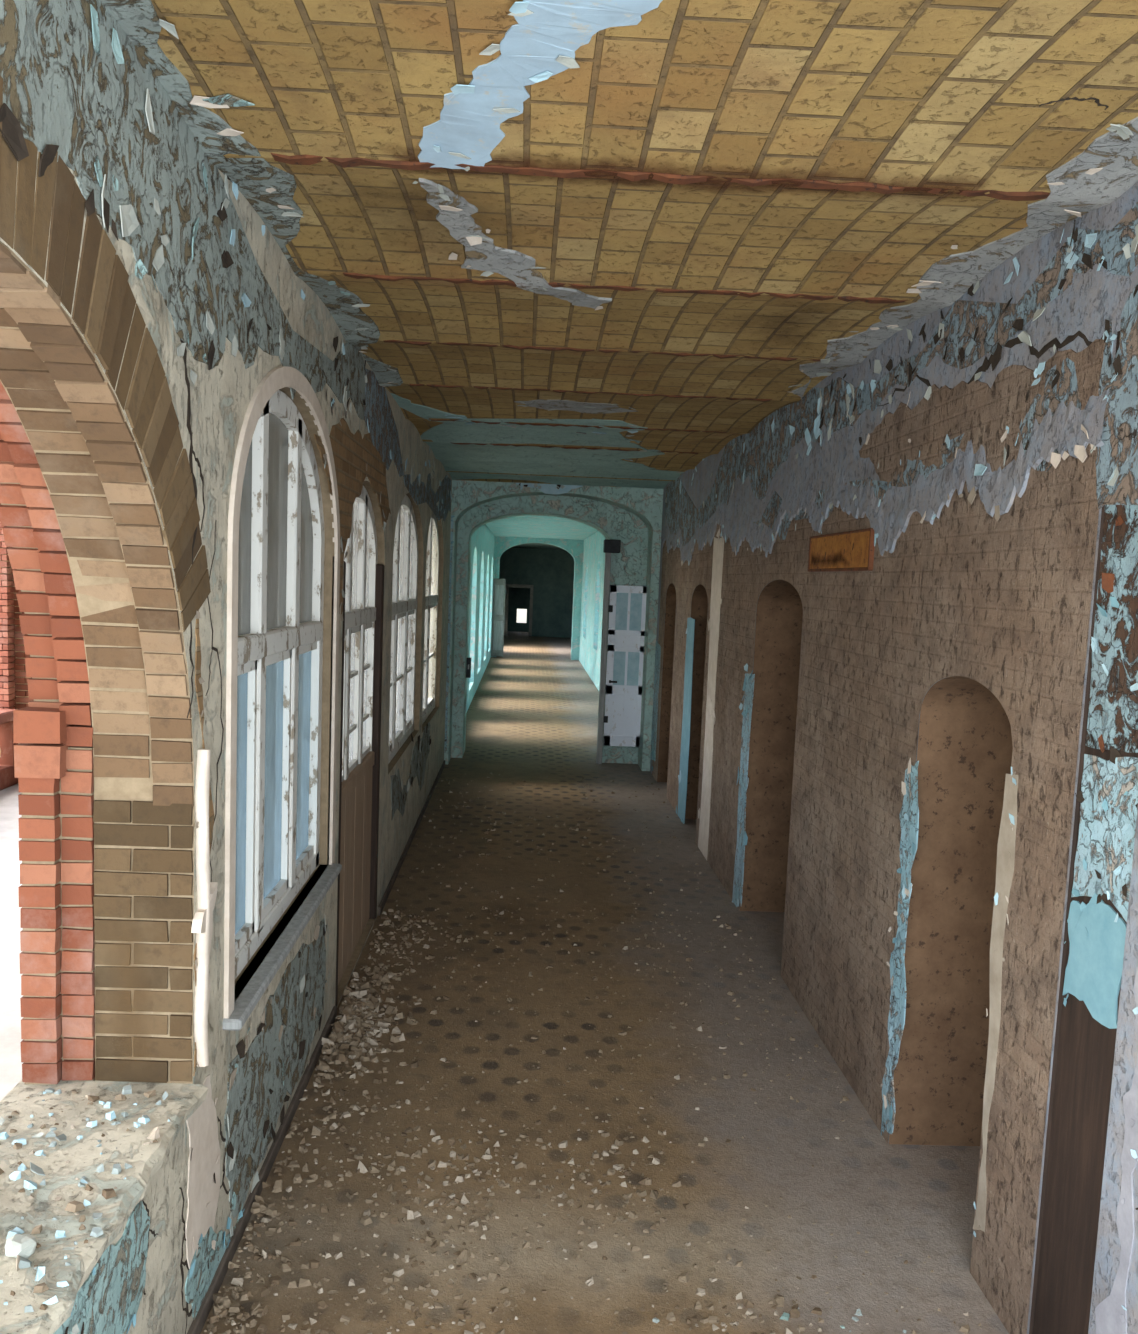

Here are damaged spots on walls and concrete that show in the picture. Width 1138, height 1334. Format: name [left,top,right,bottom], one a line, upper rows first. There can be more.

peeling [0,0,1138,621]
peeling [54,1201,150,1334]
peeling [184,611,327,1320]
peeling [390,722,431,821]
flaking render [650,283,1138,1334]